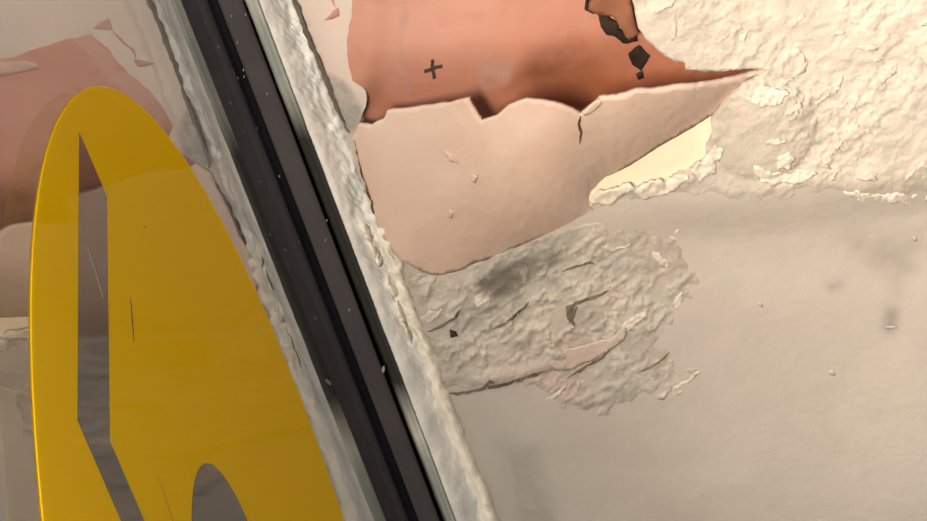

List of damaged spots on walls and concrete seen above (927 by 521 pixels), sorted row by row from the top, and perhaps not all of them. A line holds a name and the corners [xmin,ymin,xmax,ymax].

spalling [347,0,927,416]